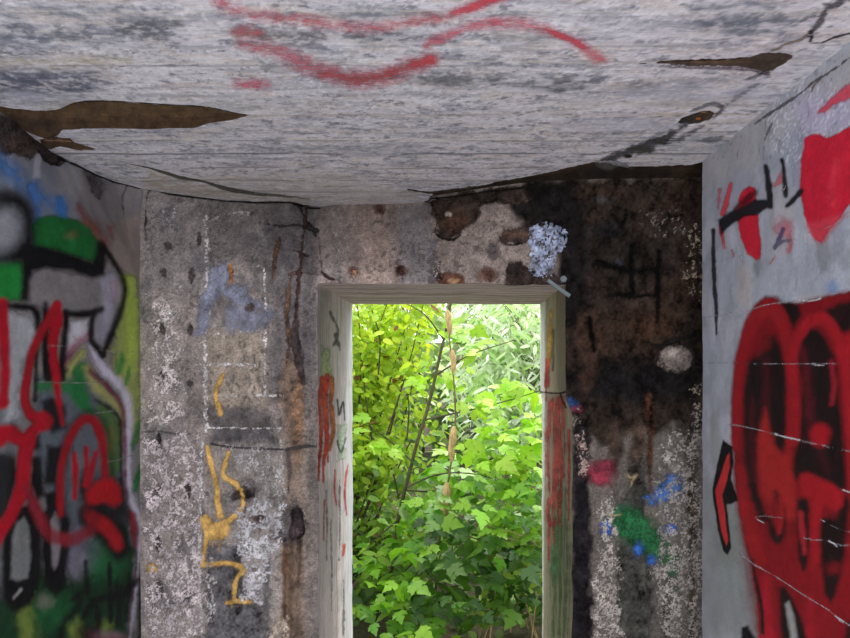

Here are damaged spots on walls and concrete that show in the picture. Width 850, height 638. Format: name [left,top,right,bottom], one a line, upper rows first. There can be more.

crack [771,0,850,51]
spalling [0,100,247,166]
spalling [84,171,106,199]
crack [57,157,336,281]
spalling [408,160,703,285]
peeling [651,209,702,306]
rust [281,205,318,453]
water stain [480,177,703,638]
peeling [225,443,308,606]
peeling [267,615,290,638]
rust [282,539,302,638]